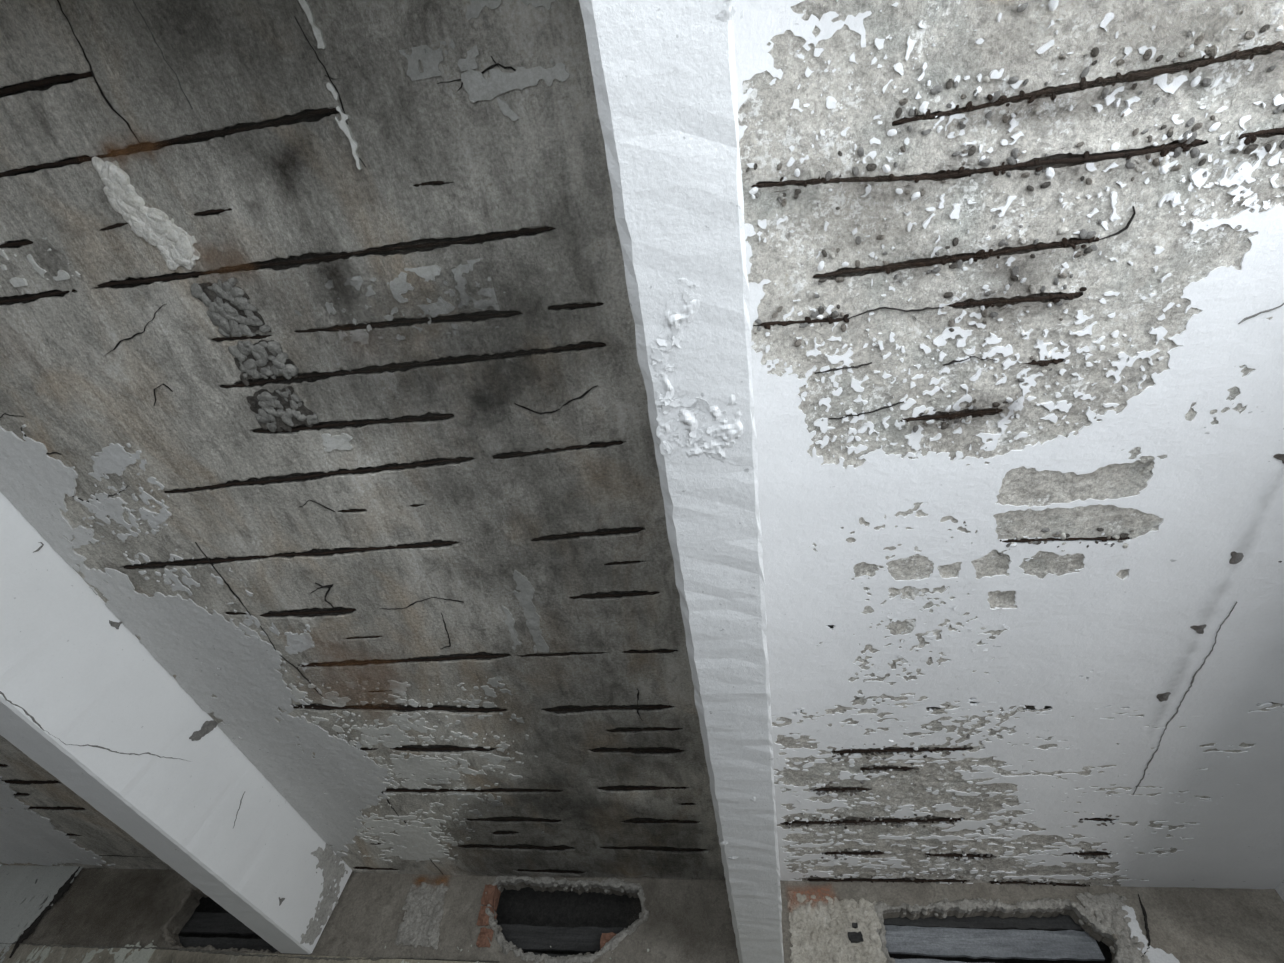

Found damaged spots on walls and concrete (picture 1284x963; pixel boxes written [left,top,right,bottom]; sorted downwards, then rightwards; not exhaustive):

crack [57,0,141,143]
crack [437,56,516,91]
spalling [738,0,1284,469]
crack [1099,206,1136,240]
spalling [252,412,454,433]
peeling [651,278,746,462]
crack [848,307,944,319]
crack [0,691,193,762]
peeling [0,424,624,963]
spalling [772,447,1197,887]
crack [1133,601,1237,795]
peeling [1122,905,1180,963]